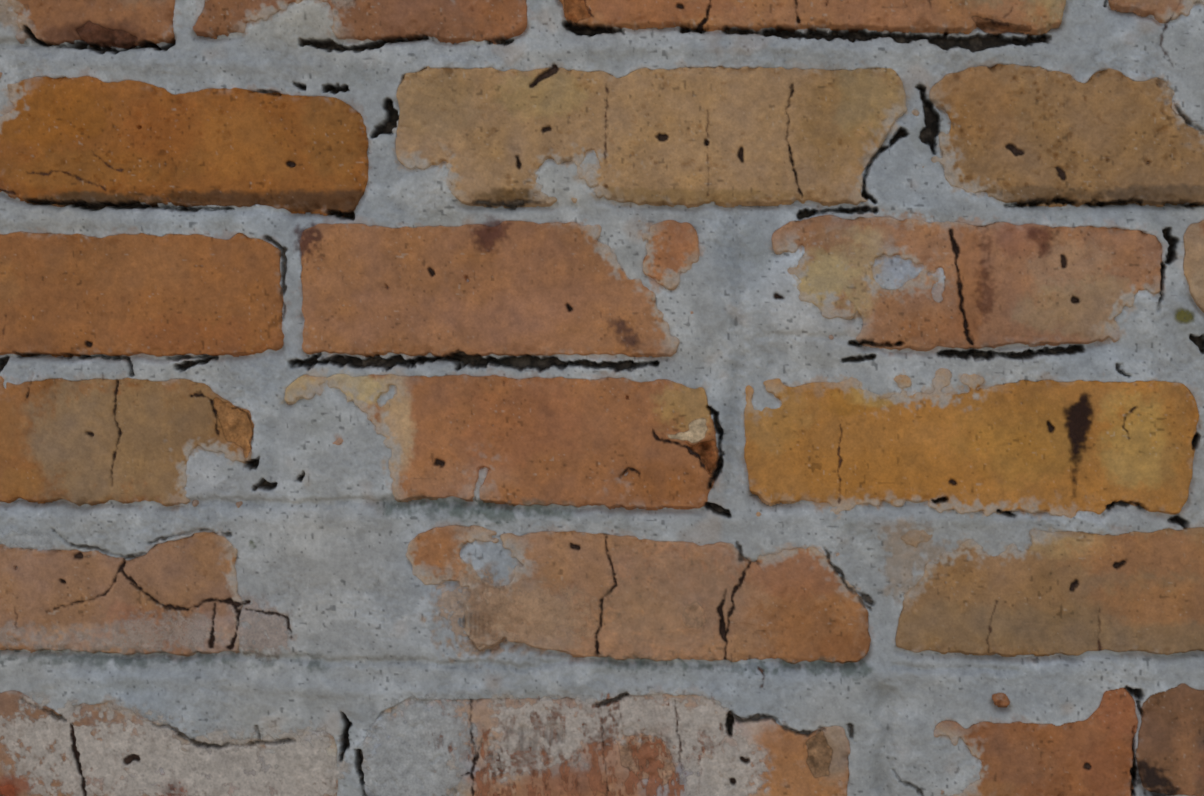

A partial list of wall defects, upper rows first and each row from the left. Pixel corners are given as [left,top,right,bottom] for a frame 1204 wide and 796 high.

crack [697,5,711,33]
crack [949,229,973,345]
crack [112,381,121,468]
crack [54,559,292,650]
crack [596,541,617,655]
crack [717,562,751,659]
crack [70,724,87,796]